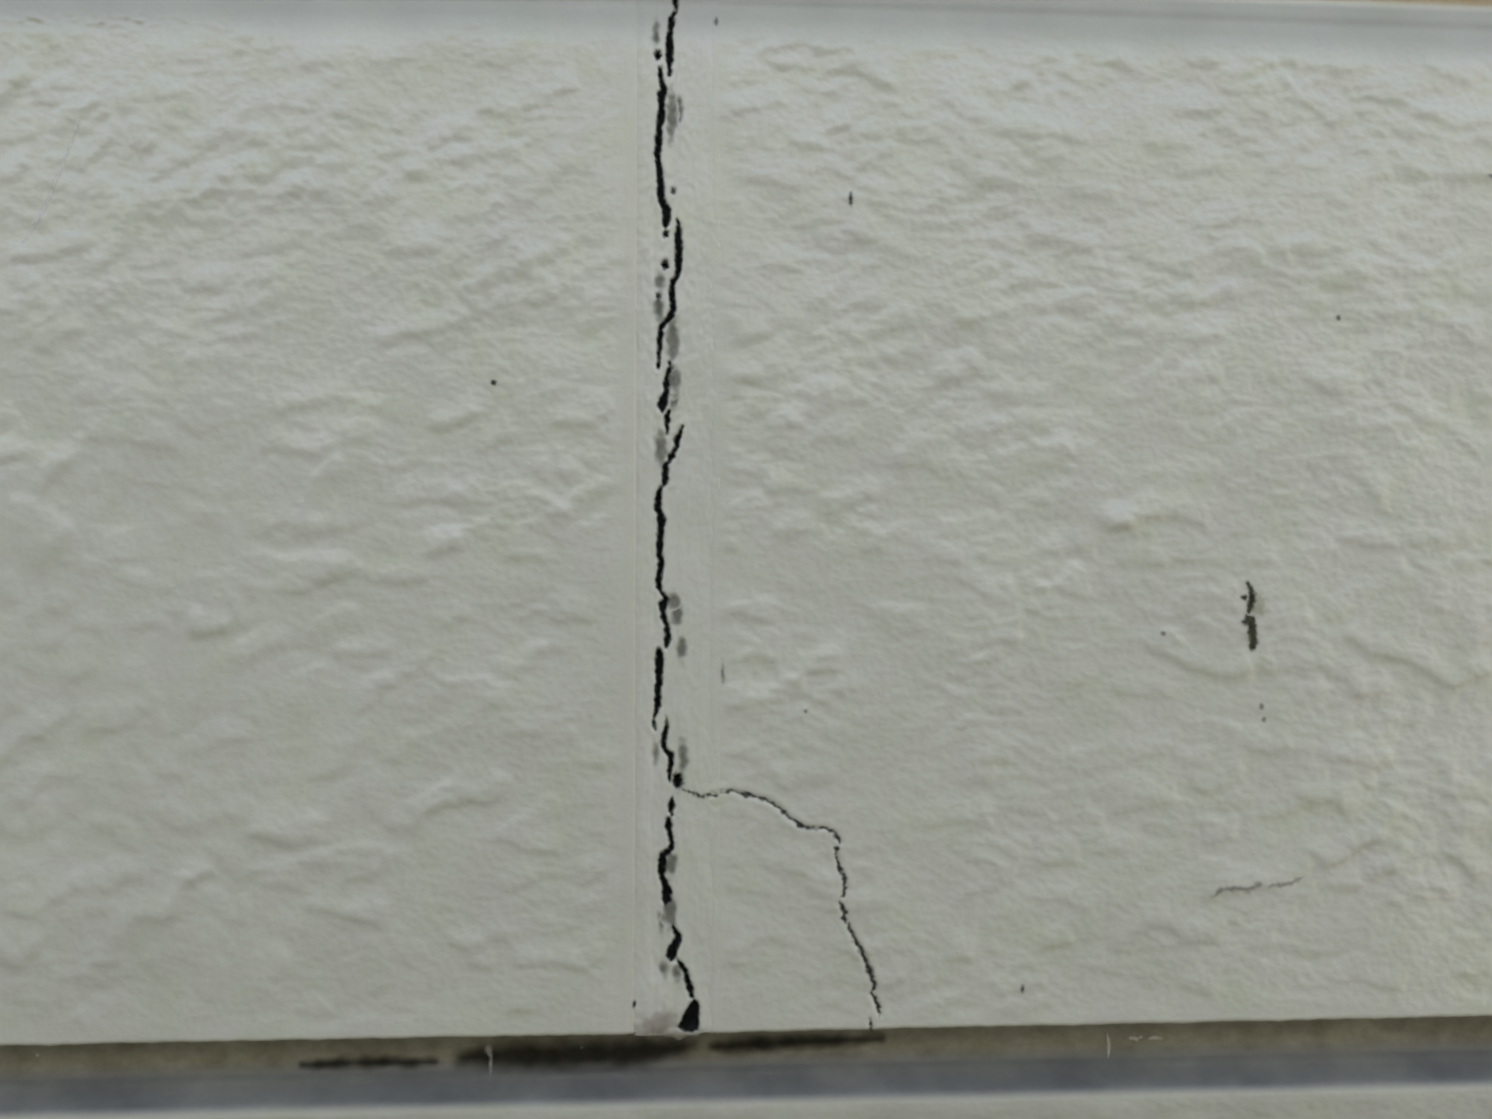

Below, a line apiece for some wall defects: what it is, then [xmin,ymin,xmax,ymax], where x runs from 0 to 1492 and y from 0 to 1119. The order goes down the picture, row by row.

crack [652,0,881,1030]